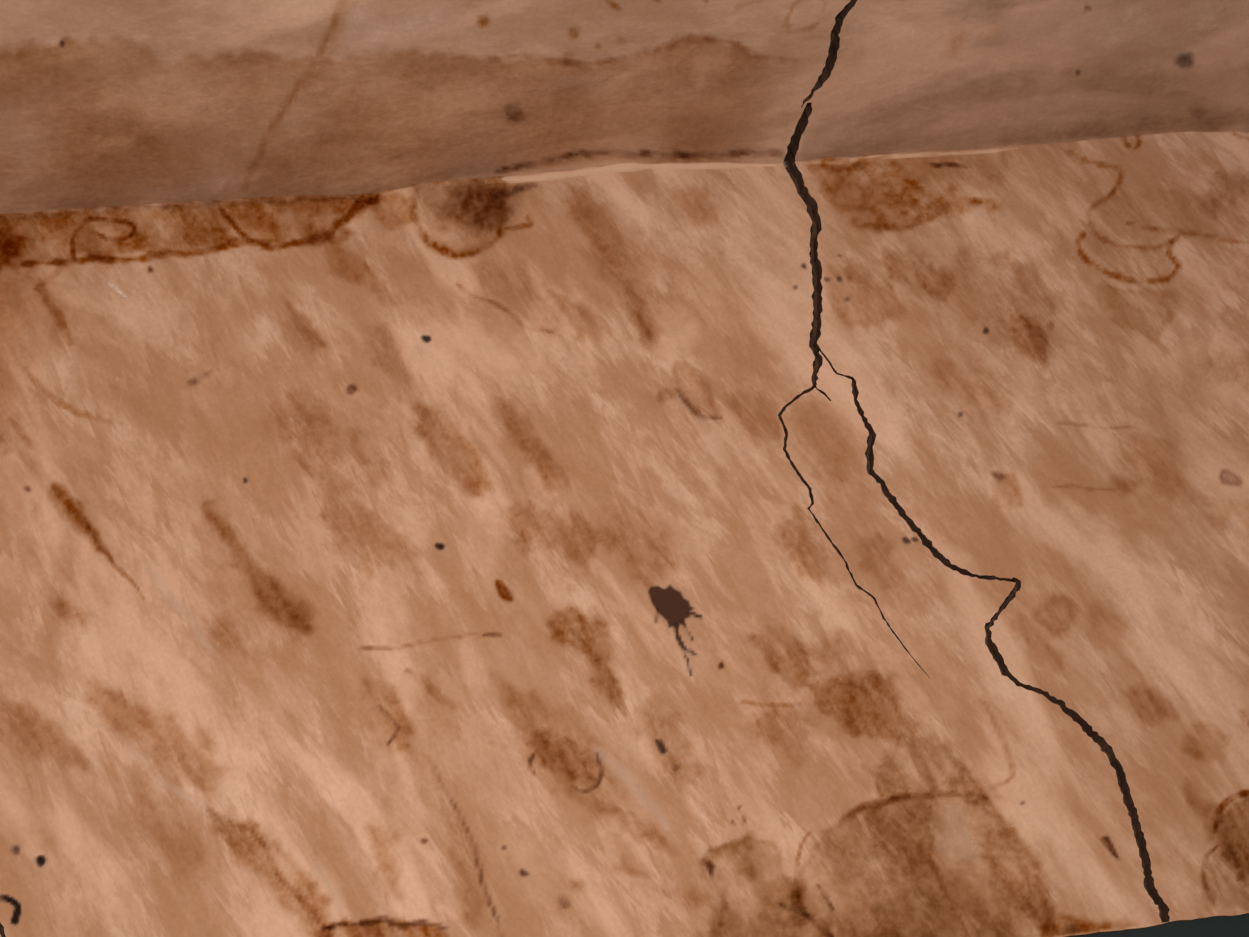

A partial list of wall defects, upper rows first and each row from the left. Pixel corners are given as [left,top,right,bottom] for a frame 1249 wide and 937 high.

leakage [649,586,702,674]
crack [778,0,1170,922]